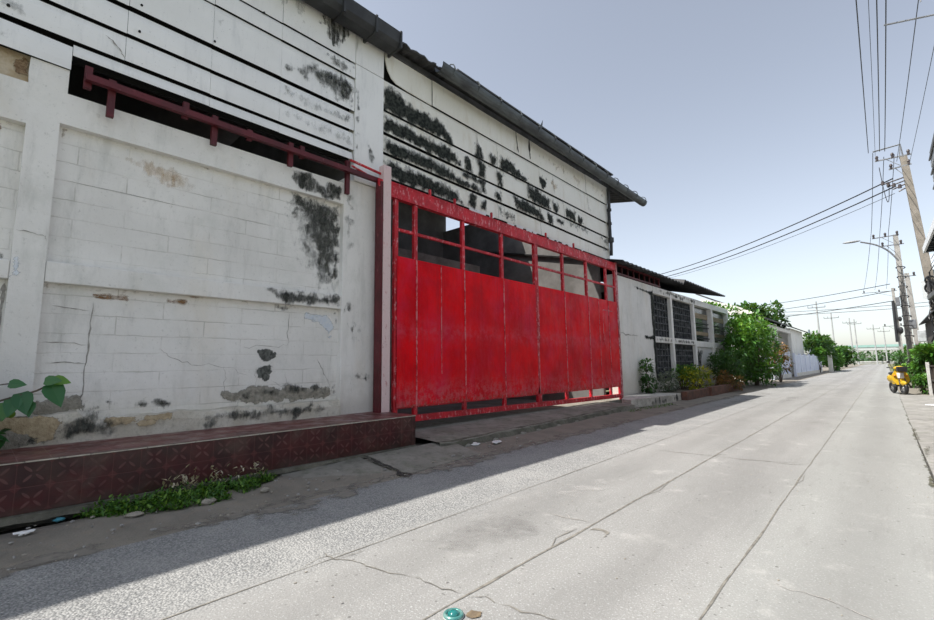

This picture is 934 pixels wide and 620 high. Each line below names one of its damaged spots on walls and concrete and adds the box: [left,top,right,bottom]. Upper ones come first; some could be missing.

flaking render [0,46,31,82]
water stain [292,172,351,279]
water stain [463,145,527,210]
water stain [548,203,583,224]
crack [48,305,94,399]
crack [160,367,879,620]